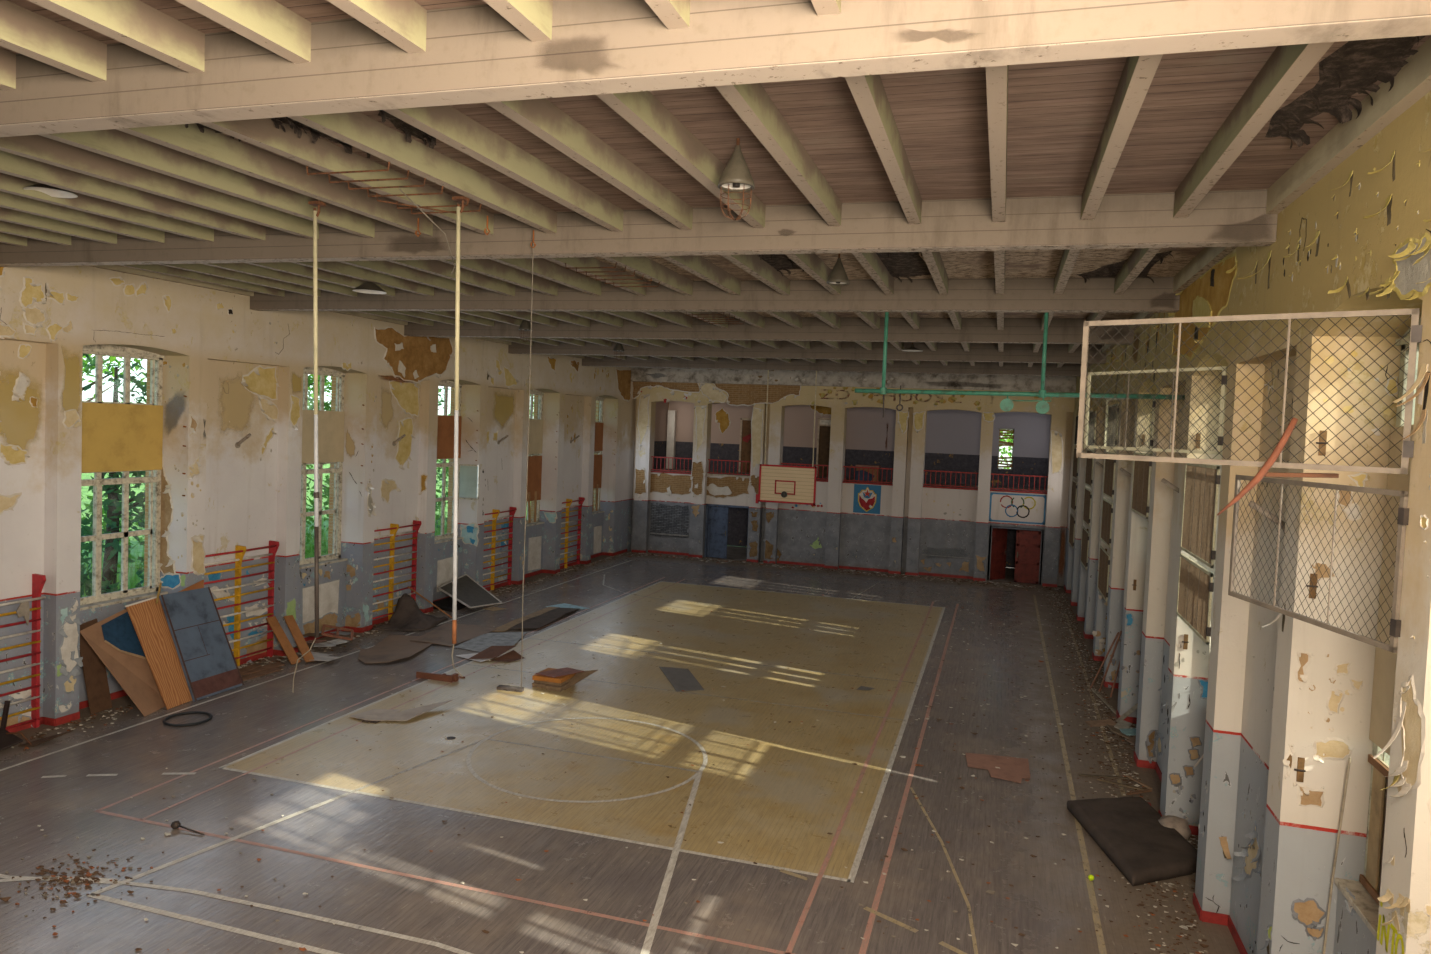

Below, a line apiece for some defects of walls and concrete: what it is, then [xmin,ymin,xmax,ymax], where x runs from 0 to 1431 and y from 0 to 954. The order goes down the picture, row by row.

peeling [1255,150,1431,300]
peeling [0,443,30,465]
peeling [0,344,38,408]
peeling [226,365,301,461]
spalling [366,326,453,518]
flaking render [547,355,995,562]
spalling [1145,643,1209,763]
peeling [1169,736,1207,836]
peeling [1384,674,1425,797]
peeling [1291,898,1326,941]